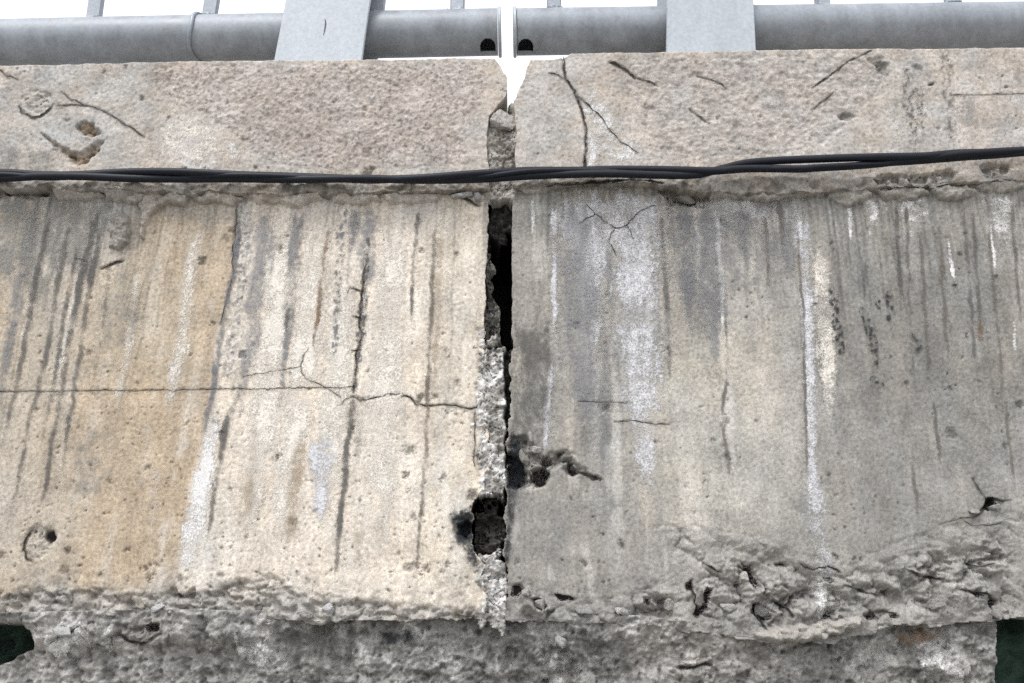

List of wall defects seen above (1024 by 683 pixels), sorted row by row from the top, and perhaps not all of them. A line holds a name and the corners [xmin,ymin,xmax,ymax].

spalling [44,120,105,166]
crack [547,56,663,254]
leakage [0,197,112,499]
leakage [180,203,420,572]
crack [246,238,485,467]
leakage [504,189,845,573]
spalling [0,562,487,645]
leakage [450,505,480,571]
spalling [506,436,600,490]
spalling [505,512,1024,649]
crack [907,563,994,601]
crack [938,478,1012,526]